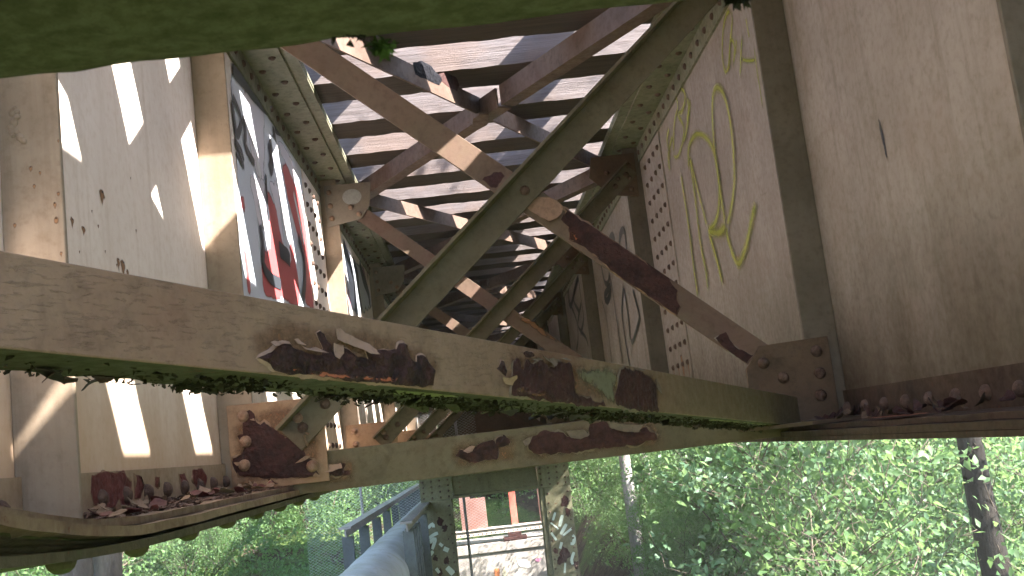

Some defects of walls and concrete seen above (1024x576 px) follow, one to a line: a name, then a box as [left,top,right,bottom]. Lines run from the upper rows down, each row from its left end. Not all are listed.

rust [0,355,772,433]
peeling [456,351,662,465]
peeling [91,470,160,508]
peeling [178,468,208,490]